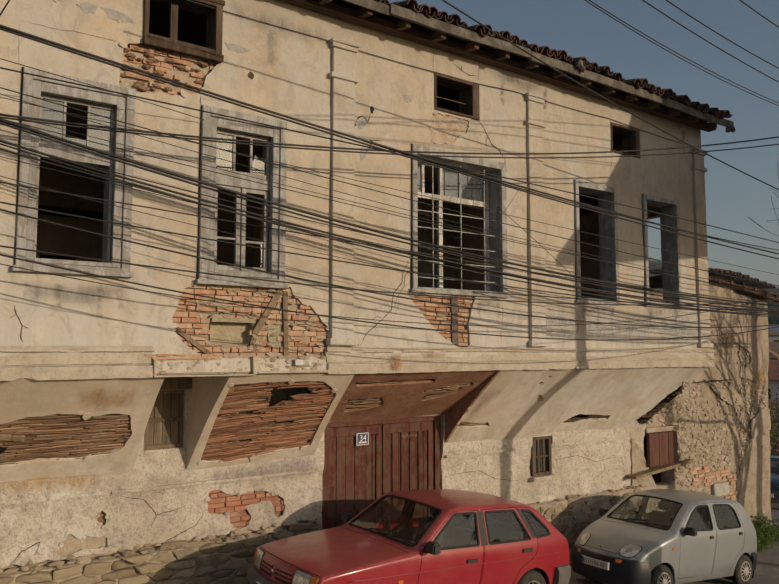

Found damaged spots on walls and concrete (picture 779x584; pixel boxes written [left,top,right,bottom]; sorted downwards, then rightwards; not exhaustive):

flaking render [119,42,217,98]
flaking render [429,112,471,145]
crack [357,260,411,345]
flaking render [409,293,476,347]
flaking render [145,283,337,465]
flaking render [637,381,684,424]
flaking render [0,412,132,465]
flaking render [56,511,111,556]
crack [124,496,204,542]
flaking render [205,490,285,529]
flaking render [631,438,659,505]
flaking render [689,465,738,501]